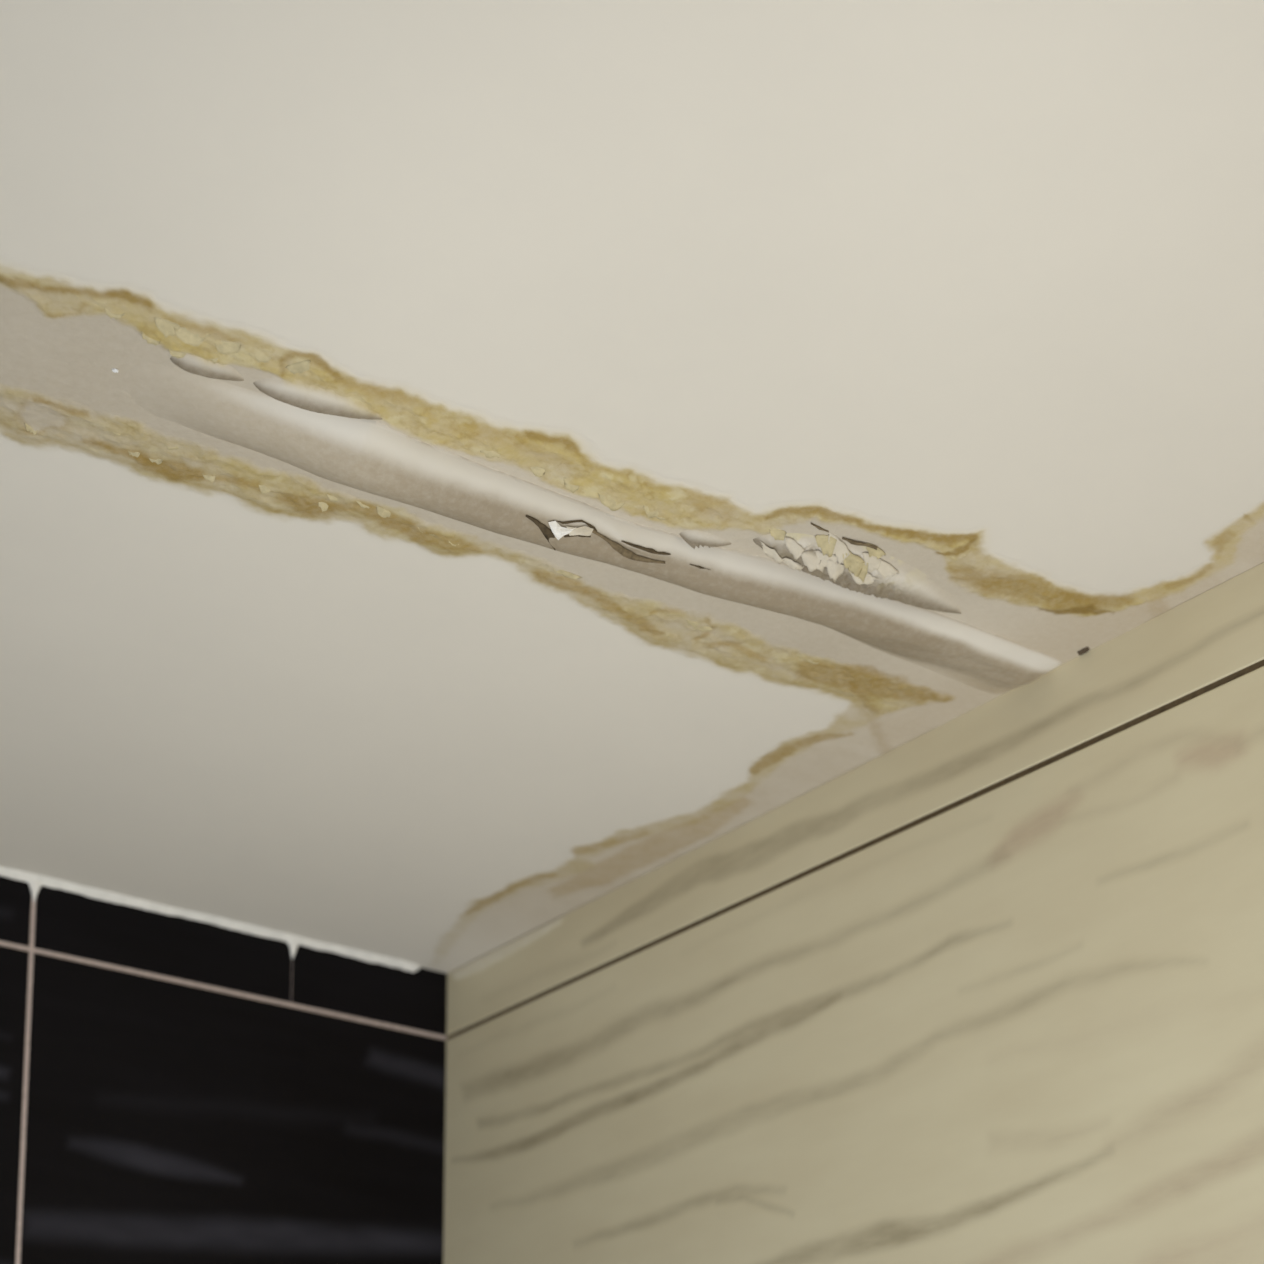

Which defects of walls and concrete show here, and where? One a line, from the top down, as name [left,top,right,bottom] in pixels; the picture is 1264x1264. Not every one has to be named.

peeling [141,317,272,363]
peeling [760,523,900,585]
damp [0,256,1264,973]